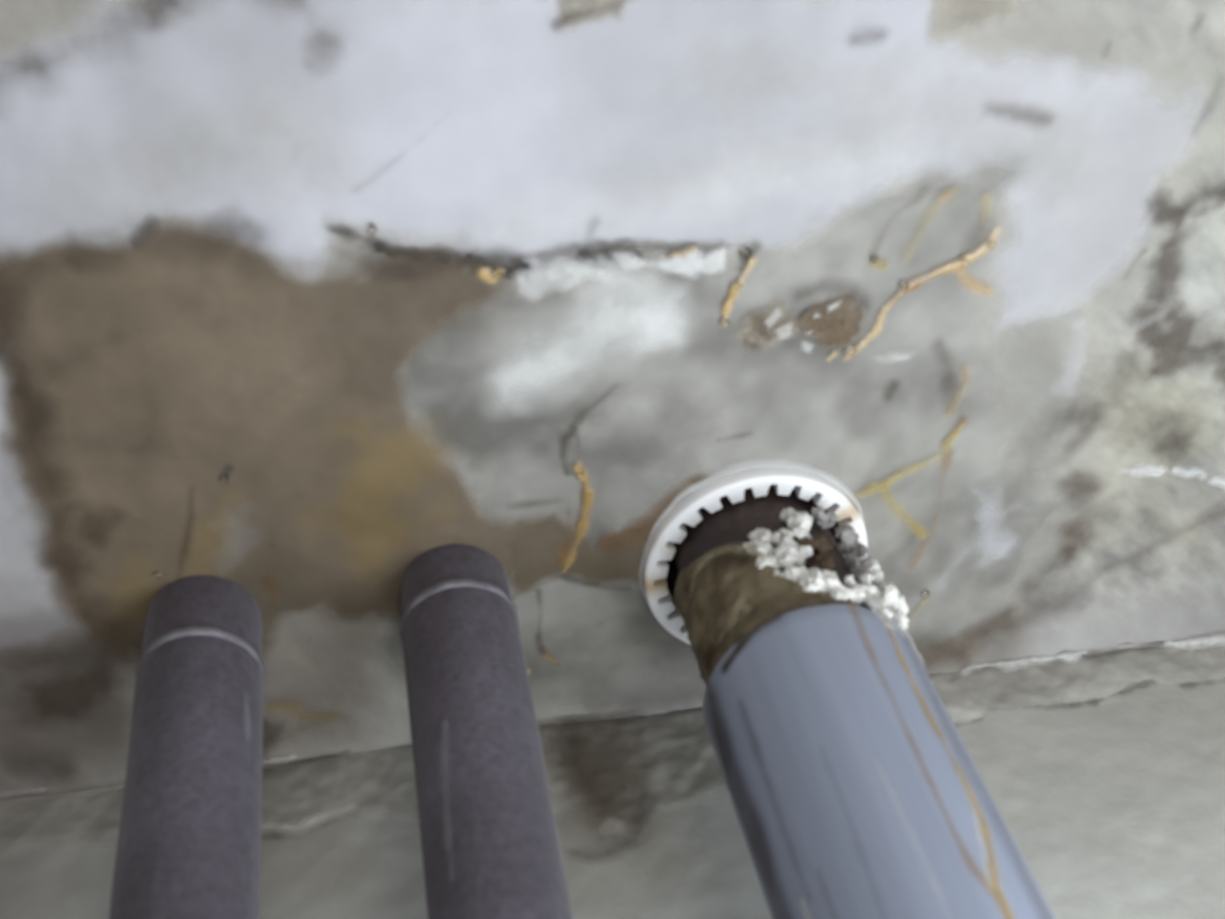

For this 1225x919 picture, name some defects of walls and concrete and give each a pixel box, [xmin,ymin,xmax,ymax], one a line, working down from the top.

spalling [738,287,868,351]
leakage [0,221,724,719]
crack [512,393,632,604]
leakage [1063,473,1100,496]
crack [528,633,558,675]
leakage [743,504,1225,673]